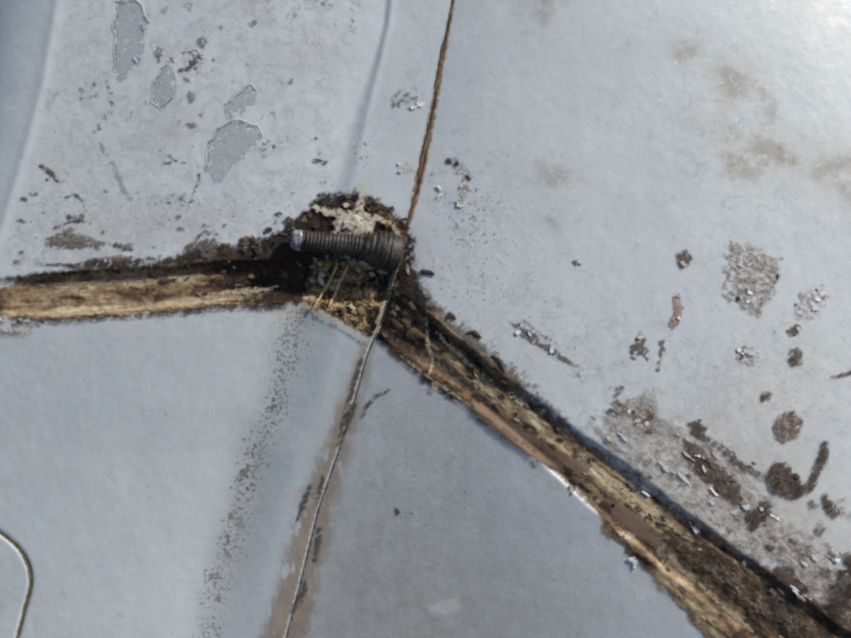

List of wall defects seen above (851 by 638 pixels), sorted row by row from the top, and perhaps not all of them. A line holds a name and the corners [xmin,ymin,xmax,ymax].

peeling [146,37,214,110]
peeling [204,83,276,183]
corrosion [0,192,360,324]
peeling [677,250,694,269]
peeling [723,241,783,316]
corrosion [301,5,851,638]
peeling [668,294,684,329]
peeling [786,284,829,337]
peeling [630,333,666,372]
peeling [788,347,803,366]
peeling [688,419,708,437]
peeling [773,411,803,444]